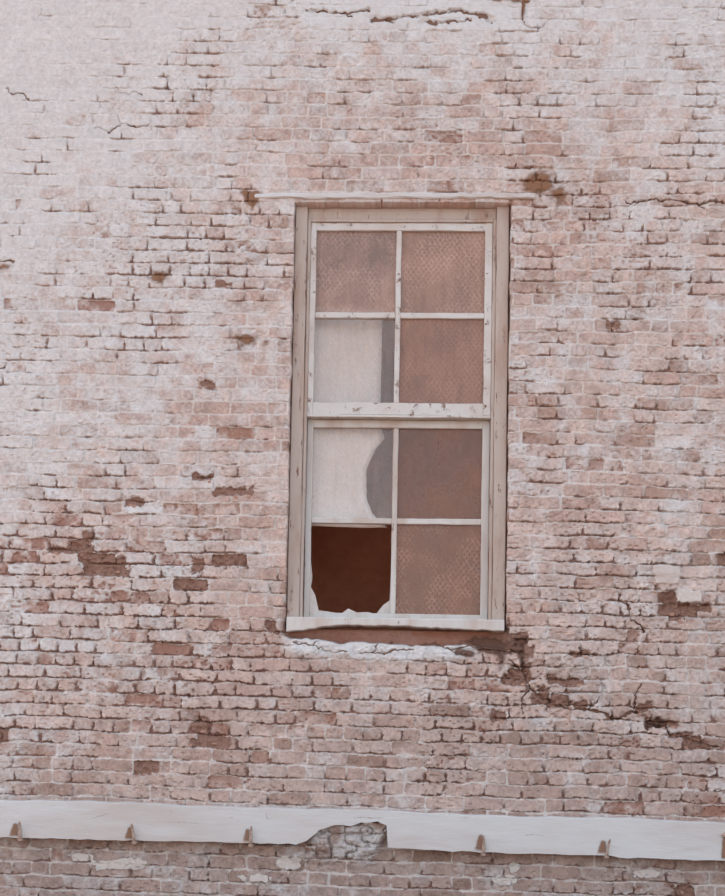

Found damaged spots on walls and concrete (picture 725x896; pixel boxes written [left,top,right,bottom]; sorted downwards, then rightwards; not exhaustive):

crack [306,9,488,26]
rust [524,173,567,204]
spalling [657,590,712,622]
crack [512,661,683,738]